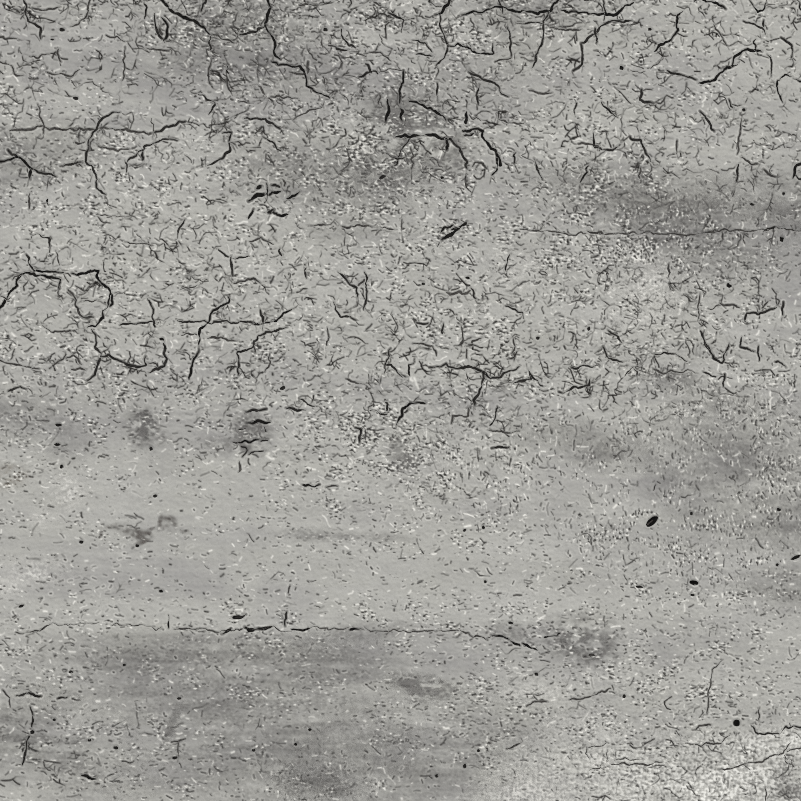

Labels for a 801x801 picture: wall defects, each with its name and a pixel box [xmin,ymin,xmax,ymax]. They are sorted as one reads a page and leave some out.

crack [0,0,80,77]
crack [0,104,185,209]
crack [144,0,330,166]
crack [328,0,634,180]
crack [580,133,651,178]
crack [633,0,801,103]
crack [729,100,801,182]
crack [0,234,292,381]
crack [326,272,368,345]
crack [384,296,785,424]
crack [370,402,426,425]
crack [0,612,560,651]